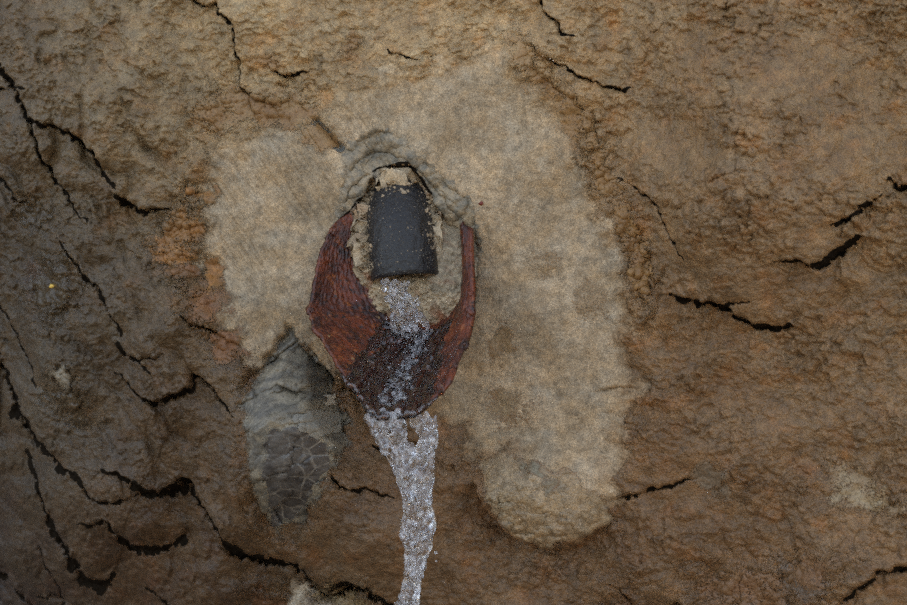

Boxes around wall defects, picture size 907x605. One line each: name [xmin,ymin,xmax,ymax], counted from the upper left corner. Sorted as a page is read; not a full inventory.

crack [193,0,265,100]
crack [269,67,309,78]
crack [0,64,169,222]
crack [341,195,365,218]
crack [372,161,432,195]
crack [617,177,684,260]
crack [773,176,907,270]
crack [56,237,233,417]
crack [669,293,794,332]
crack [0,306,394,605]
leakage [233,574,375,605]
crack [842,567,907,604]